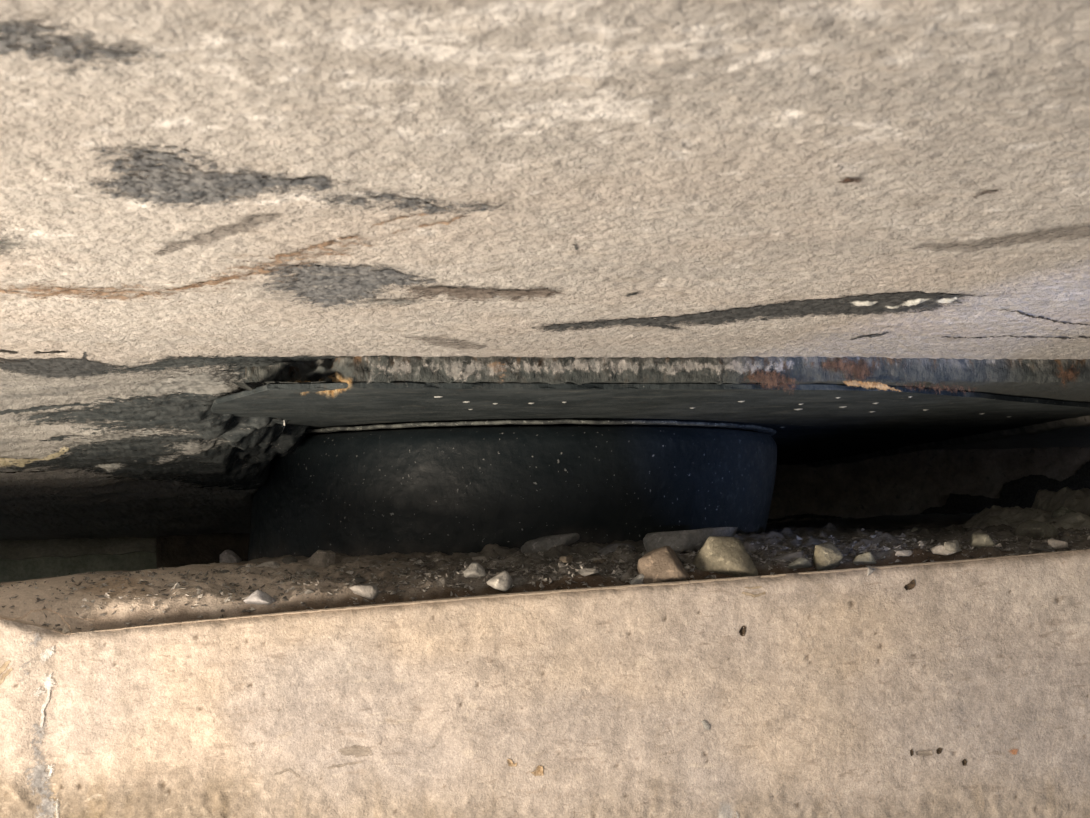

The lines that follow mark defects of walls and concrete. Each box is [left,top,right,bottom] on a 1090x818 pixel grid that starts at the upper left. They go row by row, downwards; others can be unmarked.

corrosion [0,212,467,304]
peeling [0,352,382,494]
corrosion [743,367,796,394]
corrosion [806,357,975,392]
leakage [19,631,59,818]